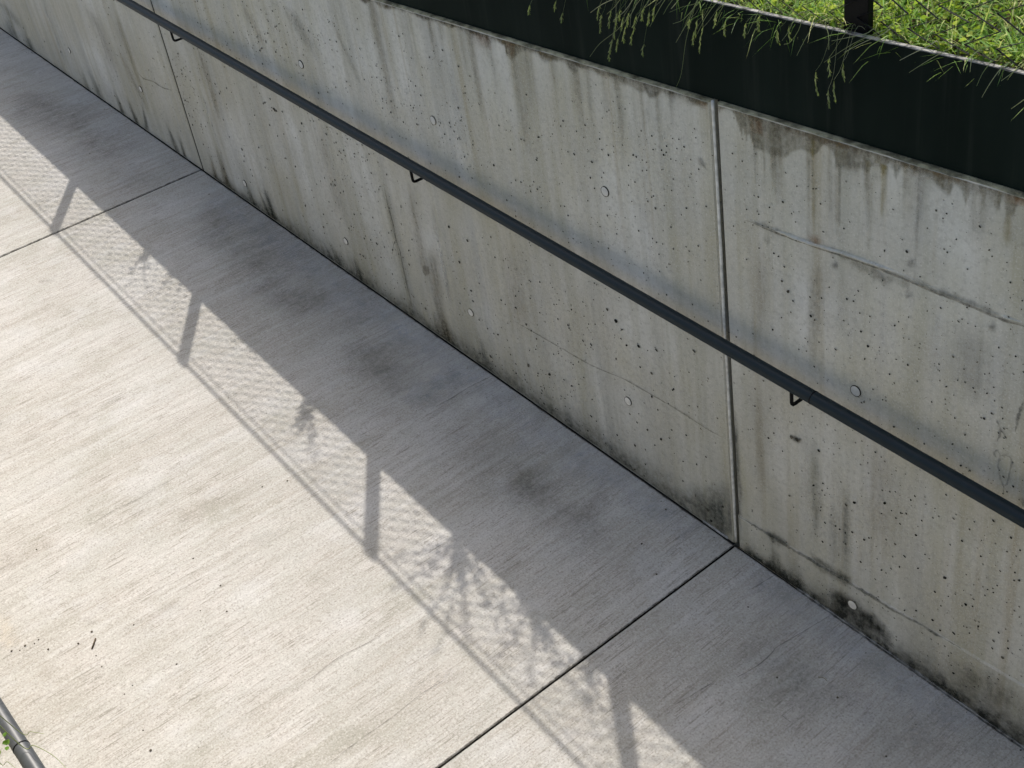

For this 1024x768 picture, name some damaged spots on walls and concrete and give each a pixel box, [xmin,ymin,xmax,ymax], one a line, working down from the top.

water stain [735,111,1019,210]
water stain [835,594,884,636]